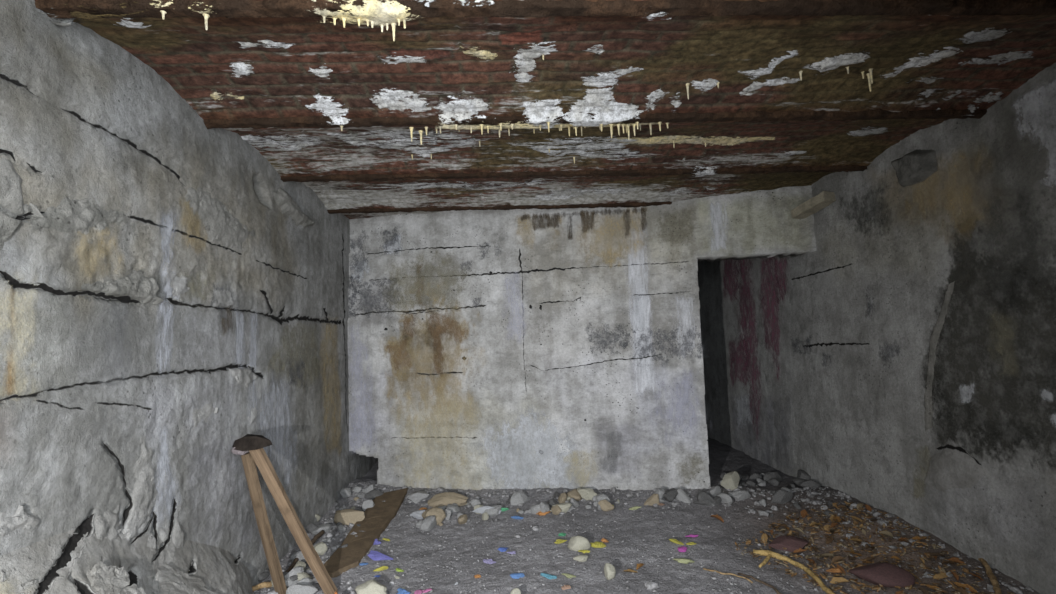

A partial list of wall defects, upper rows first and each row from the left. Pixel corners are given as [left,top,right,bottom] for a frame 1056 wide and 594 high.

damp [230,40,295,78]
damp [308,0,434,64]
damp [509,41,557,82]
damp [738,28,1034,110]
damp [241,66,775,164]
crack [0,270,140,305]
crack [127,215,488,432]
damp [521,208,702,393]
crack [0,363,263,410]
spalling [0,505,40,539]
crack [37,514,96,594]
crack [102,442,177,588]